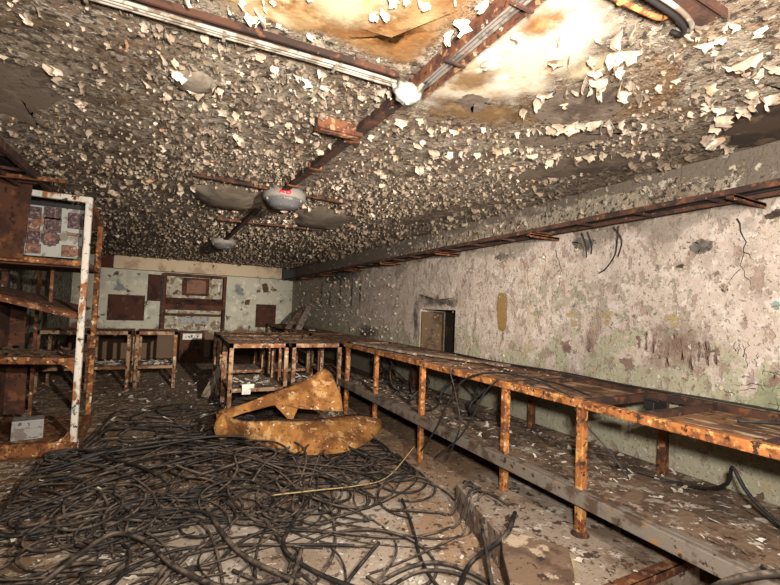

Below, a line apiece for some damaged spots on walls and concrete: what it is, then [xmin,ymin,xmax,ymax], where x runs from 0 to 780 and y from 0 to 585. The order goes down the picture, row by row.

rust [230,0,459,62]
damp [432,0,615,123]
peeling [0,0,780,371]
damp [636,314,720,372]